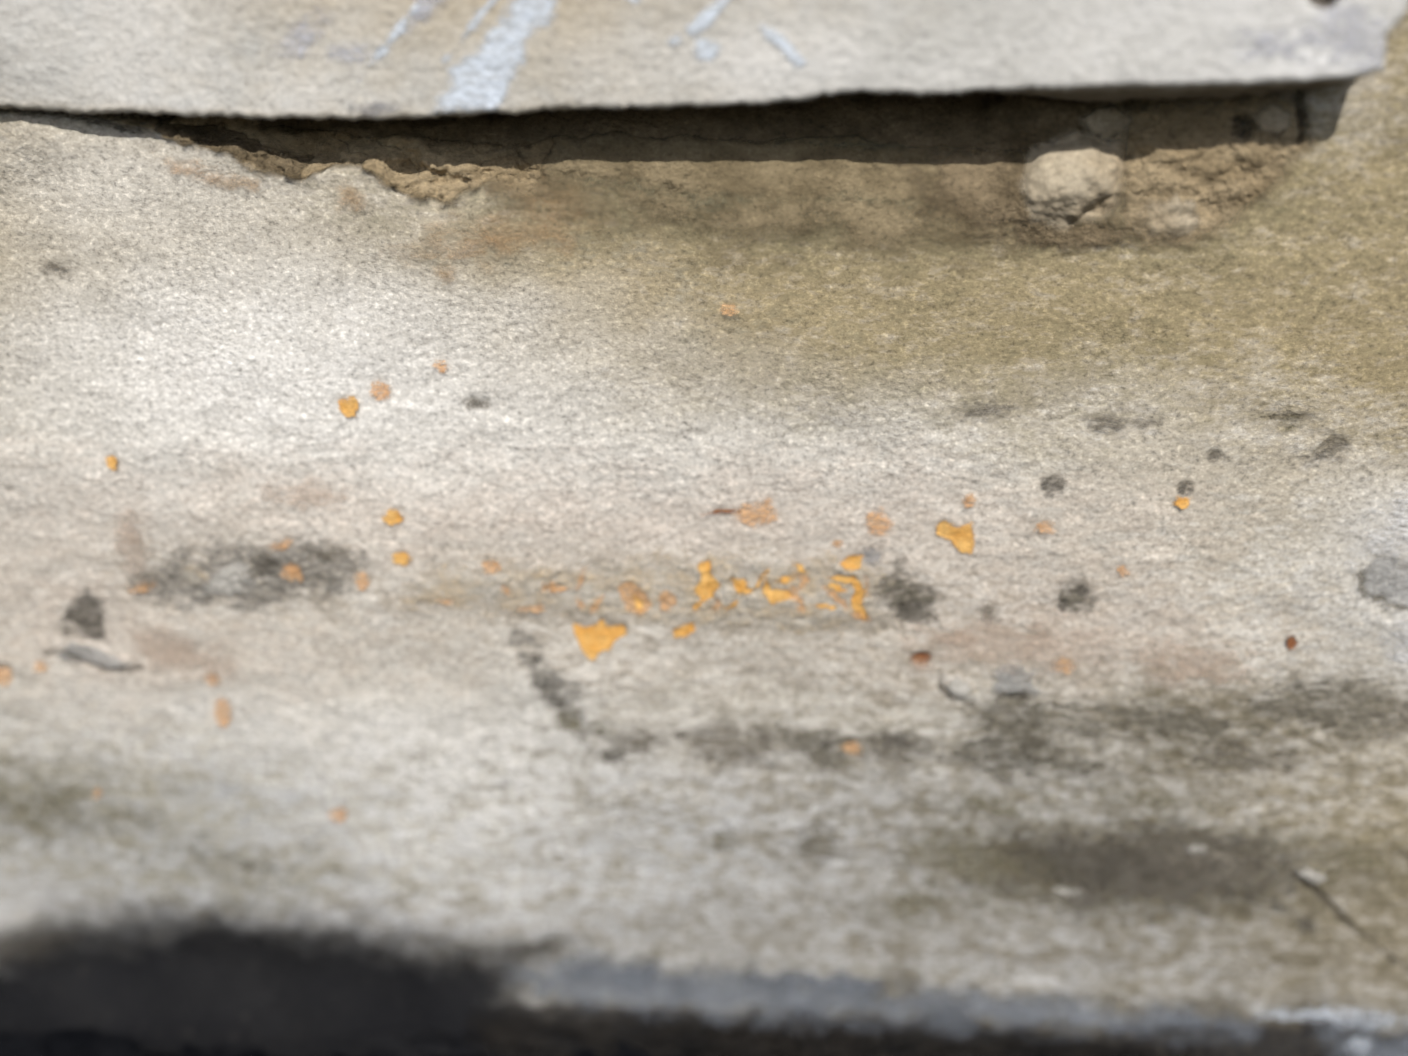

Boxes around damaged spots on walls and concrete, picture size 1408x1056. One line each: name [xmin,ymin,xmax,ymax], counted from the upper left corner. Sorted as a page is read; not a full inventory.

flaking render [95,89,1311,250]
flaking render [58,591,123,669]
crack [1296,868,1399,964]
damp [0,915,1116,1056]
efflorescence [1260,1006,1408,1056]